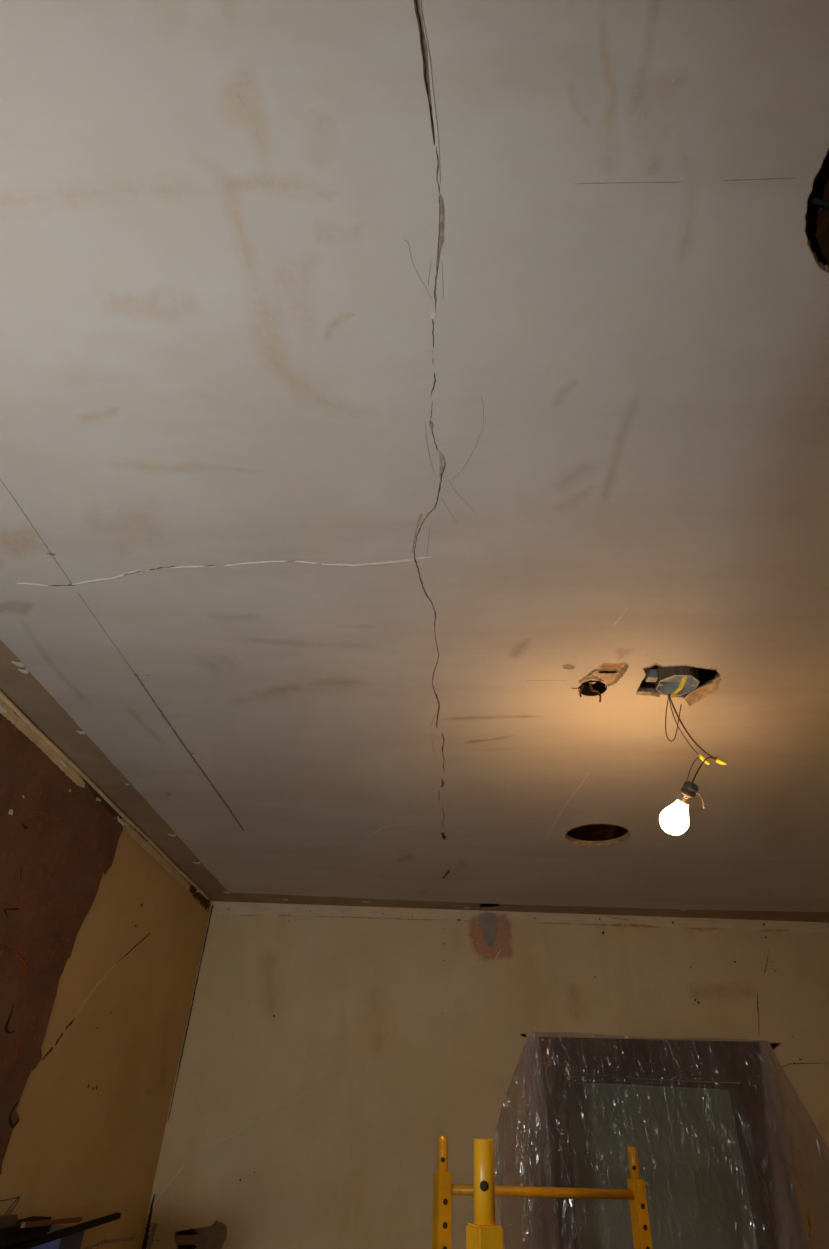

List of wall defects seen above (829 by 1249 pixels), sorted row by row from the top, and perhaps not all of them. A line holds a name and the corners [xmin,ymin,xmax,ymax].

crack [17,0,484,840]
spalling [562,662,721,706]
peeling [190,885,829,933]
peeling [0,697,147,1175]
spalling [175,1220,227,1249]